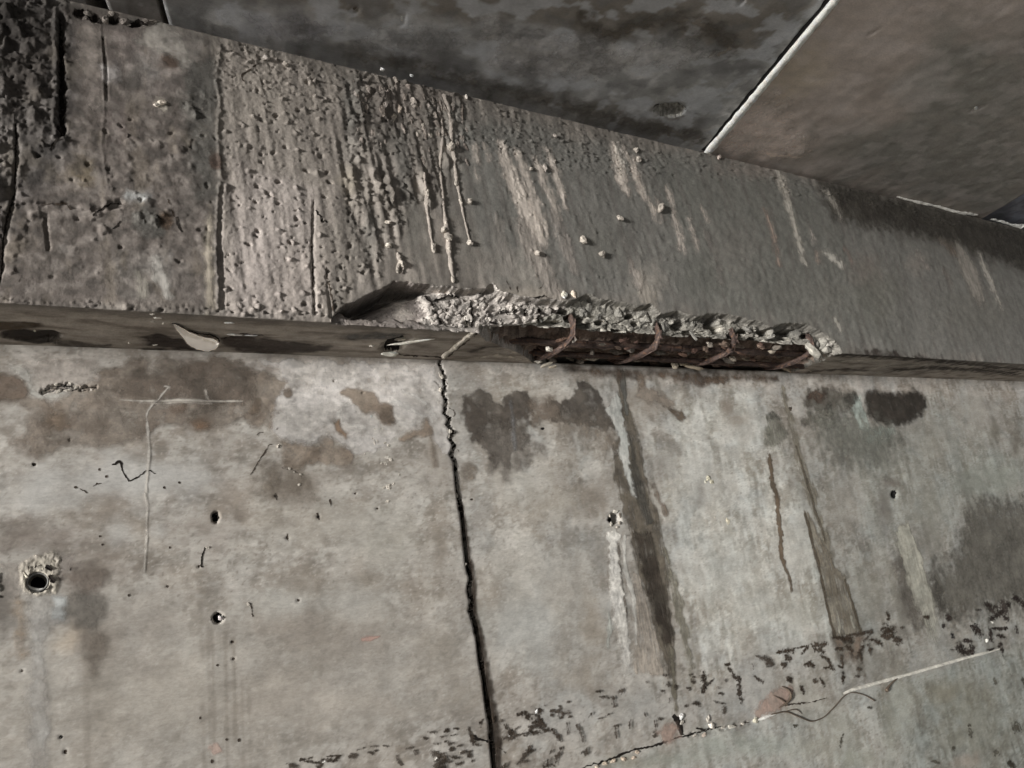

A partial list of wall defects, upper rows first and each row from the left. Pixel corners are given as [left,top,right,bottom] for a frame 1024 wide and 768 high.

efflorescence [473,140,576,301]
efflorescence [611,142,714,252]
spalling [0,552,74,597]
hole [41,382,99,394]
leakage [0,334,451,492]
crack [398,333,510,768]
leakage [423,370,743,768]
spalling [330,281,1024,375]
rust [534,314,863,674]
leakage [801,387,927,464]
leakage [752,496,1024,695]
crack [583,713,758,768]